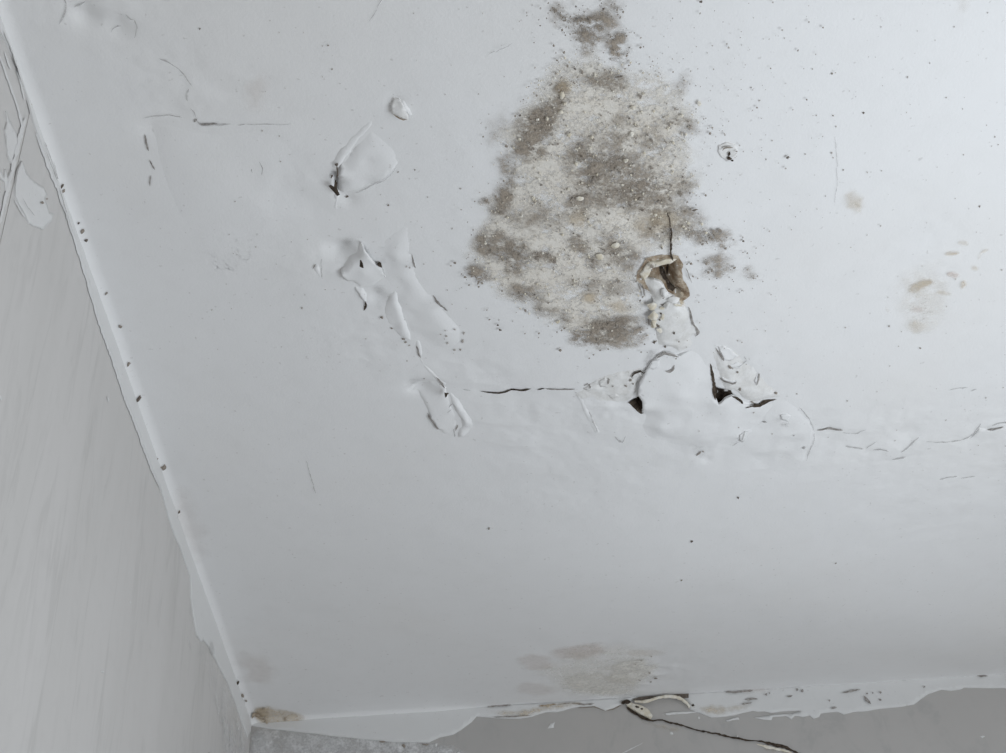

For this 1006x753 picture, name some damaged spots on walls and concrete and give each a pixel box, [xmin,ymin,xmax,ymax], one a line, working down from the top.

peeling [329,121,398,210]
mould [450,1,764,359]
peeling [341,241,386,310]
peeling [413,340,473,438]
crack [481,387,574,395]
flaking render [575,255,780,448]
crack [488,703,798,753]
peeling [621,694,695,721]